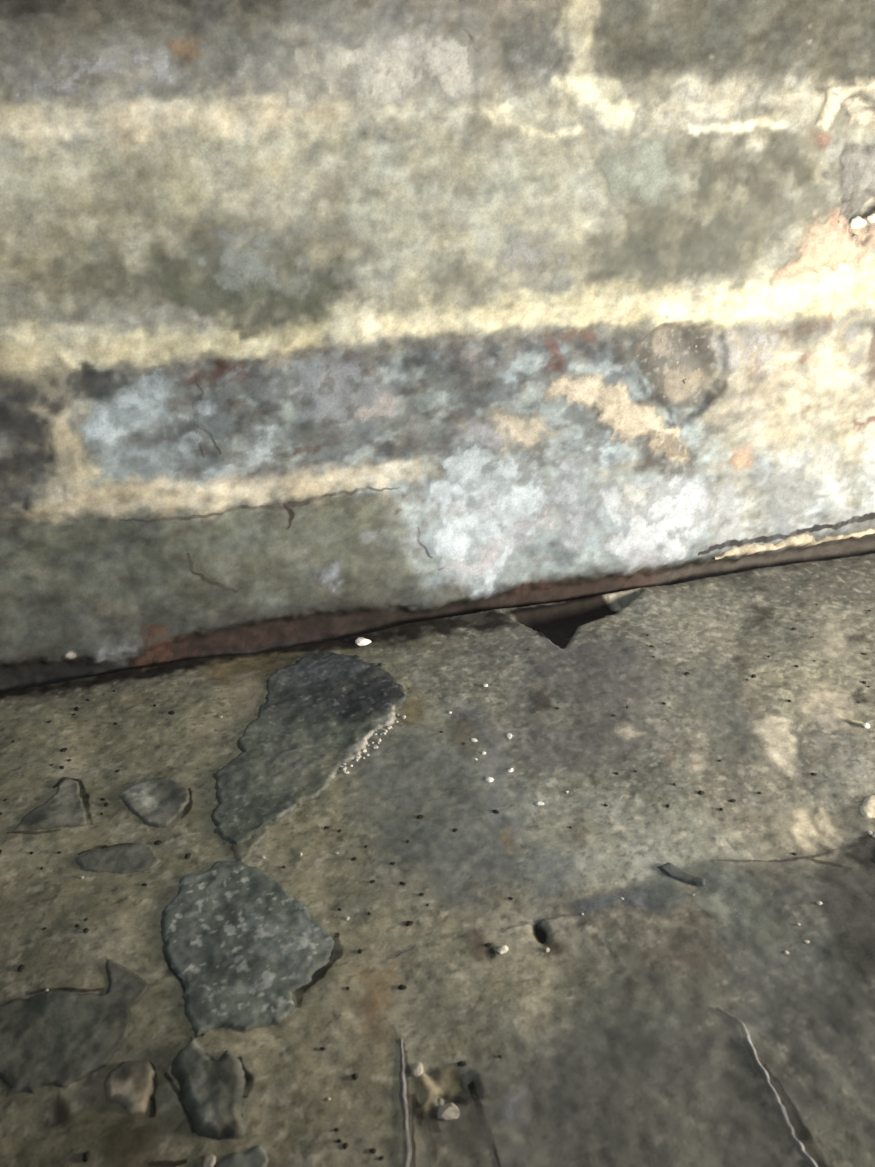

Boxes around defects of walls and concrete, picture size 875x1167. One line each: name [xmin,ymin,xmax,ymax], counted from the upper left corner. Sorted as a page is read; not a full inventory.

spalling [773,145,875,281]
leakage [0,365,185,446]
leakage [290,360,396,422]
spalling [634,324,715,414]
crack [285,506,294,529]
leakage [429,414,588,595]
leakage [599,472,741,566]
crack [0,513,875,697]
peeling [0,652,421,1167]
leakage [699,865,875,999]
spalling [411,1062,475,1140]
crack [734,1017,827,1167]